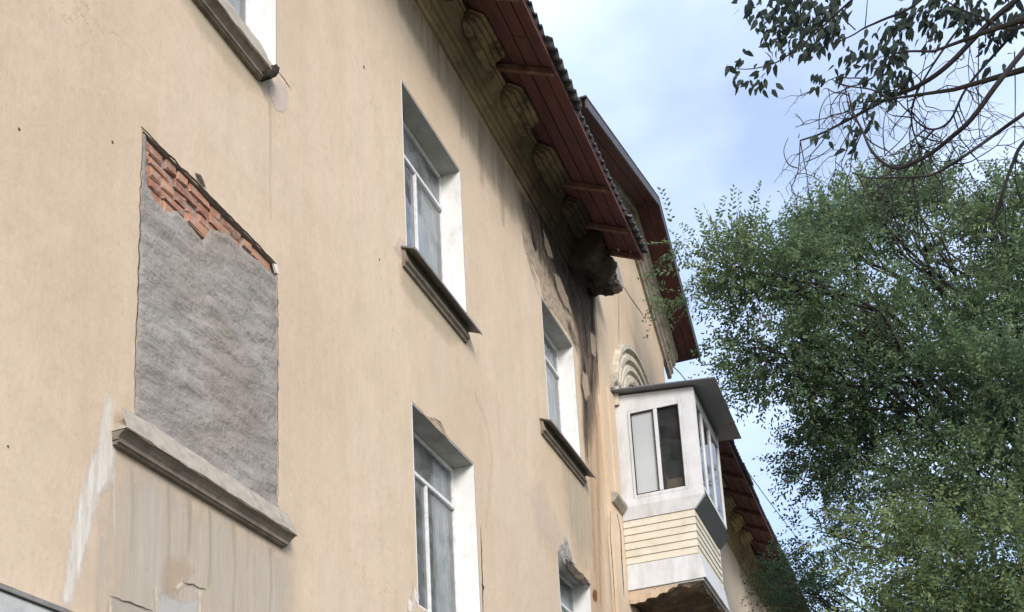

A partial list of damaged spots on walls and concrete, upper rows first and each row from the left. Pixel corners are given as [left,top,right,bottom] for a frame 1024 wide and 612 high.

flaking render [145,140,279,274]
damp [473,133,599,464]
damp [62,399,114,604]